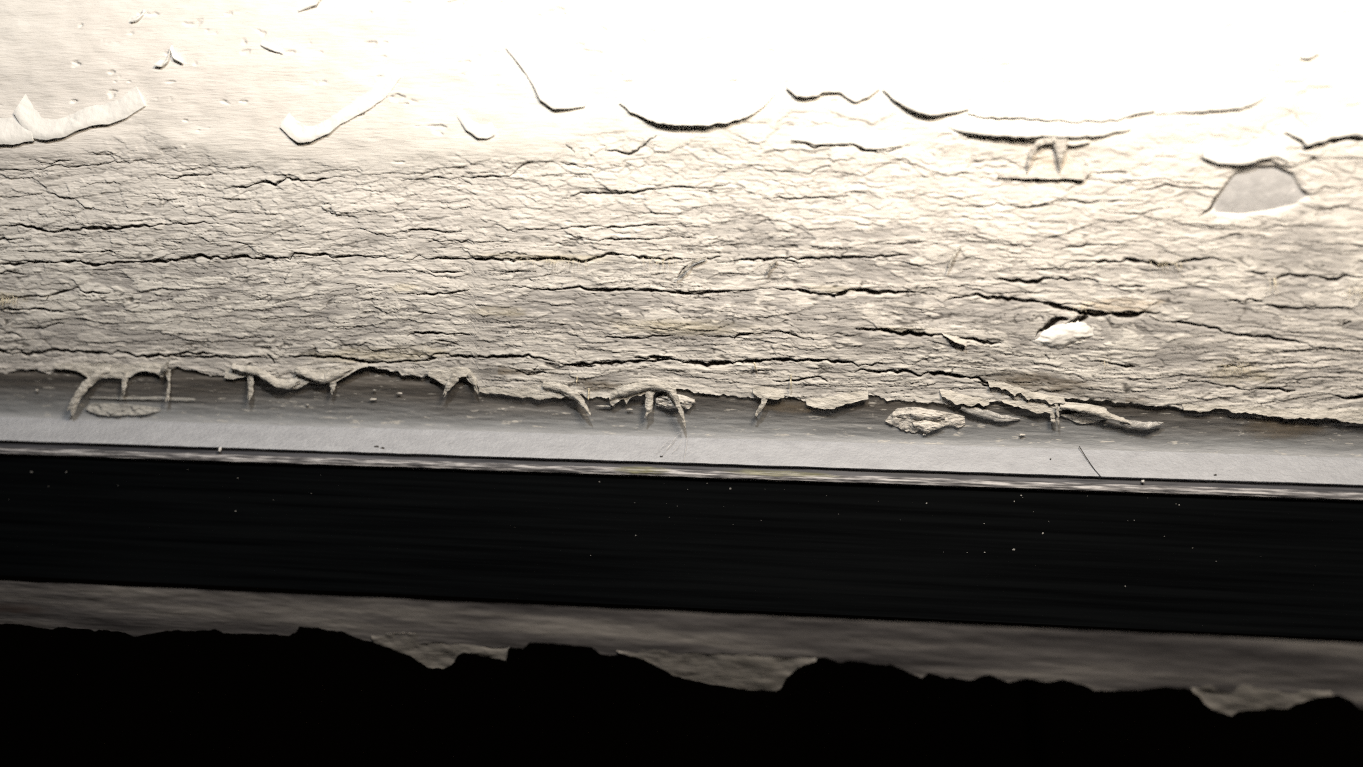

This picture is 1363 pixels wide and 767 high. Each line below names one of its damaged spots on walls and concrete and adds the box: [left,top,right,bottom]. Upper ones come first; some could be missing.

peeling [943,89,1155,180]
spalling [1202,118,1363,213]
crack [0,135,1363,392]
peeling [54,356,172,415]
peeling [224,362,368,400]
peeling [428,366,591,415]
peeling [608,380,695,429]
peeling [752,386,784,418]
peeling [806,390,868,409]
spalling [885,381,1131,436]
peeling [1182,403,1363,424]
crack [1336,393,1363,401]